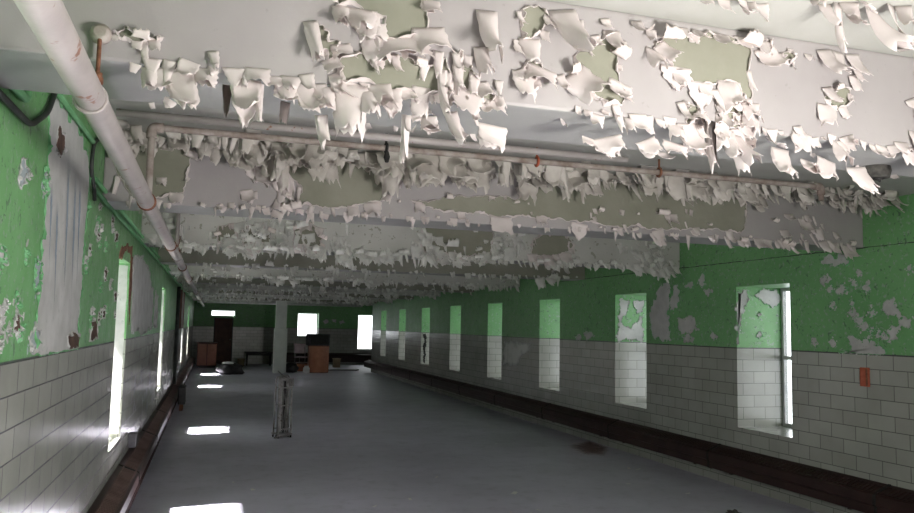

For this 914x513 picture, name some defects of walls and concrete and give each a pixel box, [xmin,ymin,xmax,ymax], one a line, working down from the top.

peeling [0,96,165,434]
rust [119,243,133,321]
peeling [111,0,914,357]